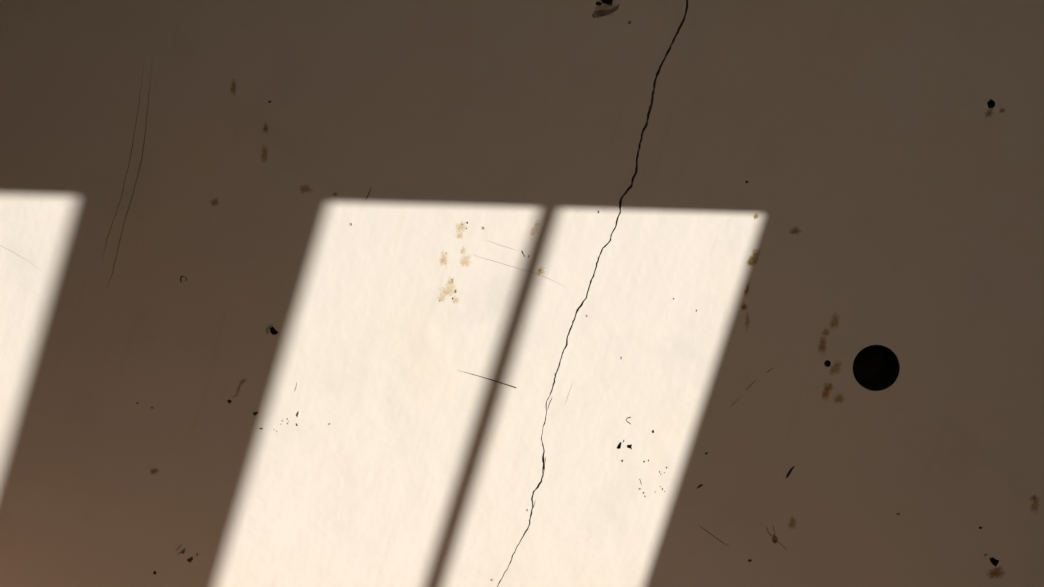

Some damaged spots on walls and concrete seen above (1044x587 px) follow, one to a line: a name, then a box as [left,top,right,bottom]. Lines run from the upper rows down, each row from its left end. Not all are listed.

crack [497,0,688,587]